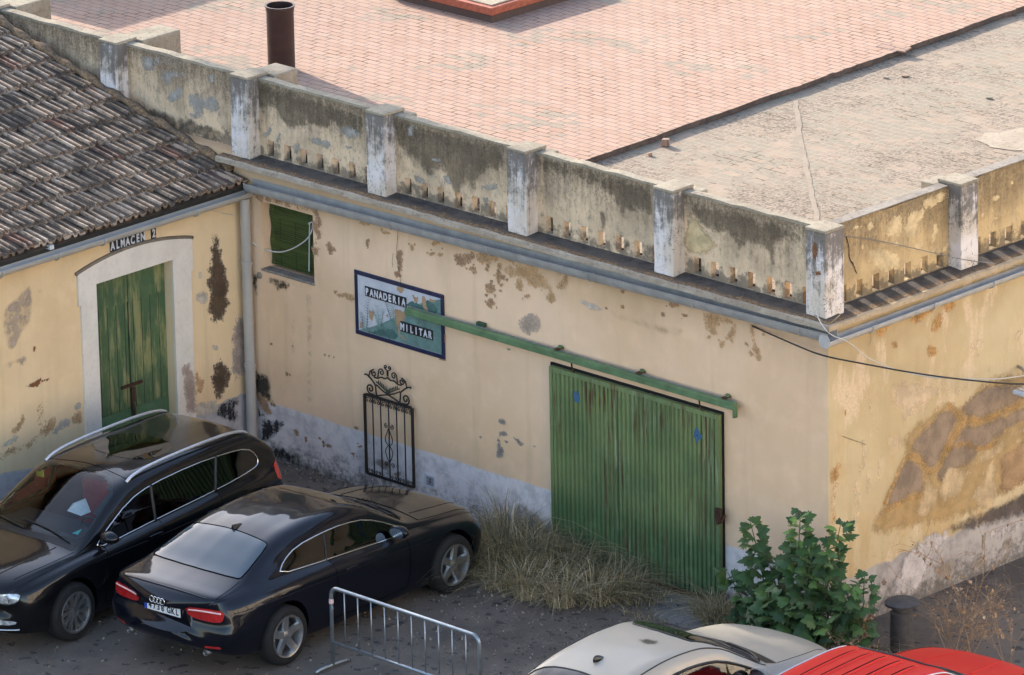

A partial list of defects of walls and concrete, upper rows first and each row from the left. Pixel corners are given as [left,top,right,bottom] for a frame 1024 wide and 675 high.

peeling [394,241,568,311]
peeling [6,290,31,347]
spalling [360,309,406,340]
spalling [519,313,540,336]
peeling [703,313,765,361]
peeling [181,362,219,416]
spalling [496,419,535,458]
peeling [917,426,1024,517]